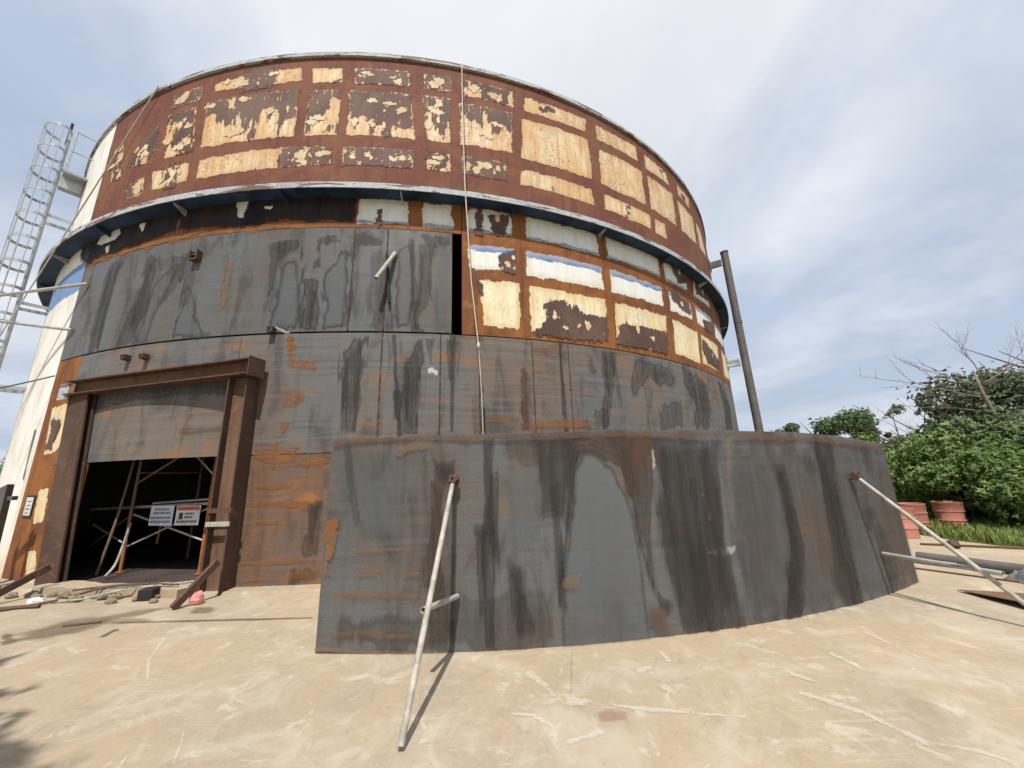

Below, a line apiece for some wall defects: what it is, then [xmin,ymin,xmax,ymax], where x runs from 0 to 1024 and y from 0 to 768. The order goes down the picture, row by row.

peeling [107,65,514,198]
peeling [474,207,509,236]
damp [270,232,381,330]
peeling [498,249,517,274]
peeling [671,266,709,314]
peeling [533,299,669,356]
peeling [702,320,721,372]
damp [392,335,421,430]
peeling [23,418,62,479]
damp [544,342,742,632]
corrosion [290,519,338,579]
damp [476,407,498,647]